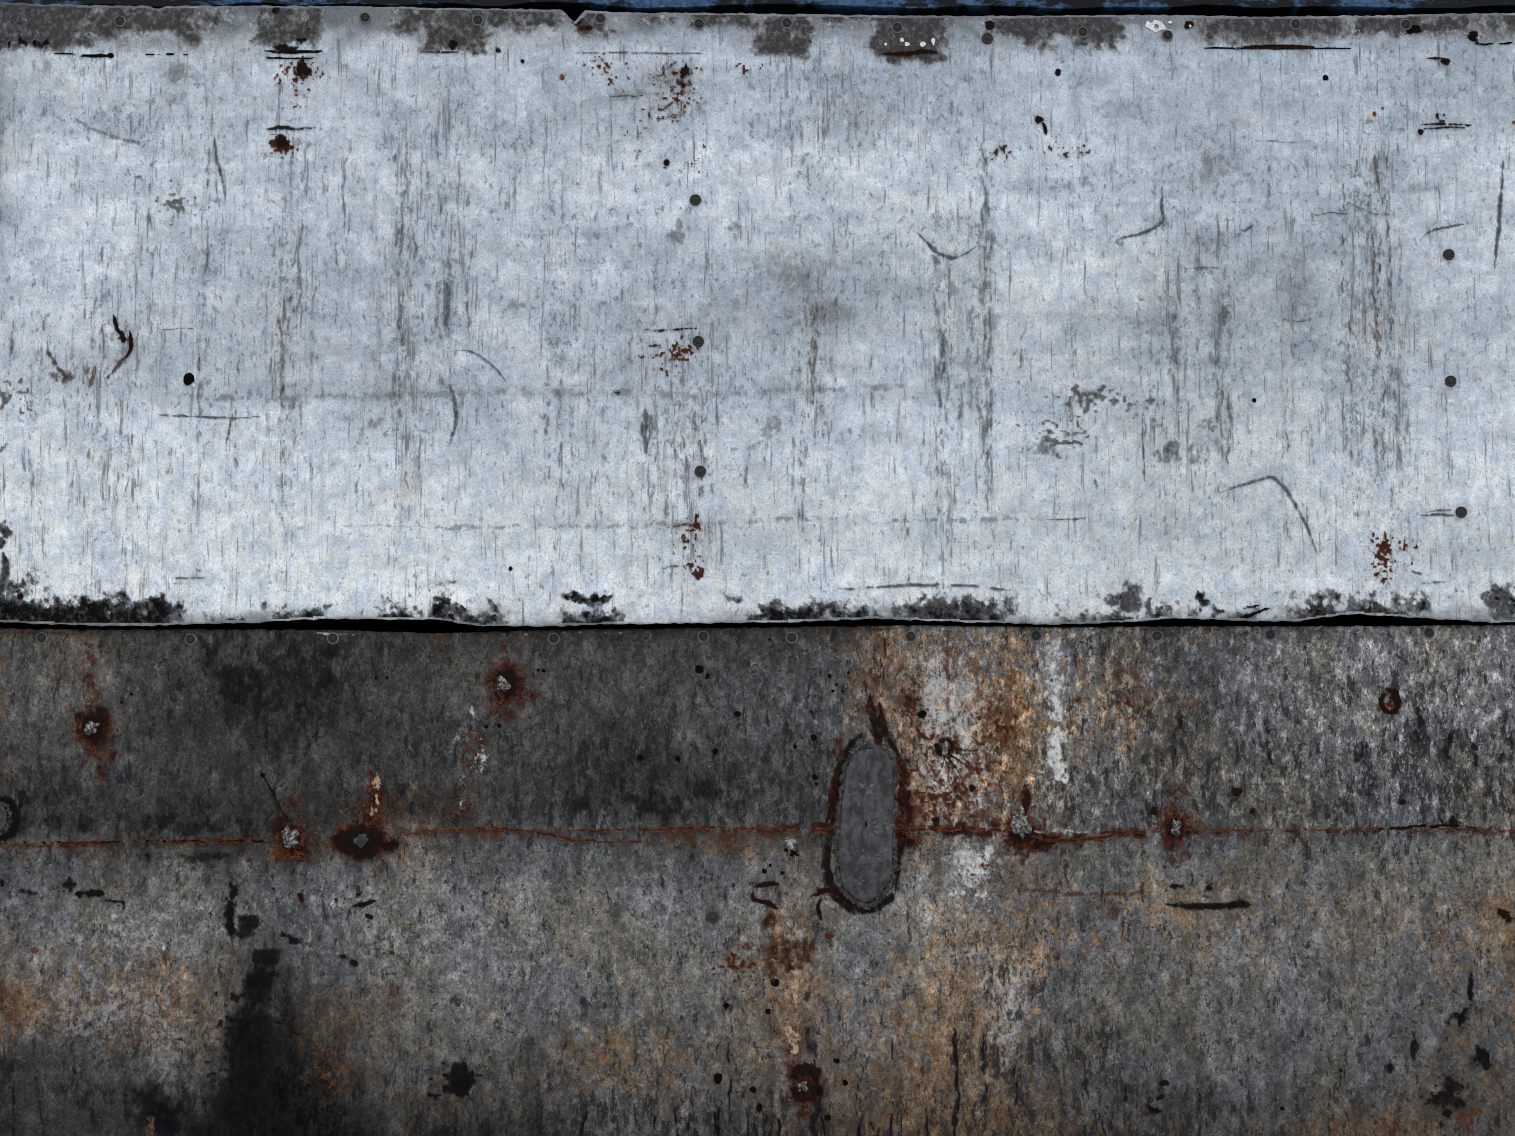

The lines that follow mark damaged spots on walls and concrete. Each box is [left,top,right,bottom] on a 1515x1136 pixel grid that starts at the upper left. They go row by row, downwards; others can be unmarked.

peeling [637,15,1515,83]
rust [559,47,706,173]
peeling [0,520,246,623]
peeling [361,580,510,625]
peeling [558,590,625,624]
peeling [723,578,1019,622]
peeling [1046,579,1458,622]
rust [3,631,131,785]
rust [402,633,539,726]
rust [1374,686,1402,739]
rust [1129,784,1212,875]
rust [709,628,1151,1136]